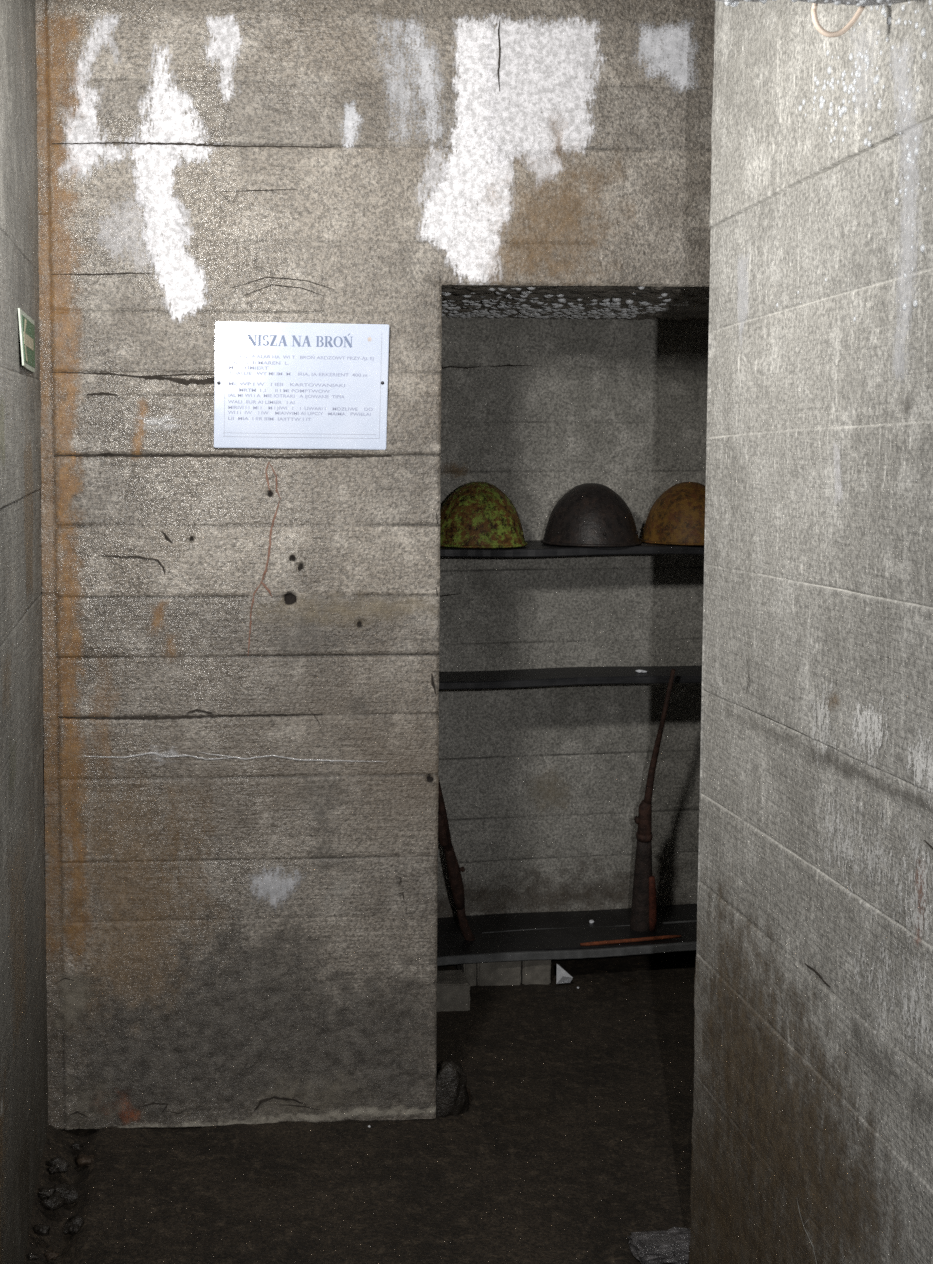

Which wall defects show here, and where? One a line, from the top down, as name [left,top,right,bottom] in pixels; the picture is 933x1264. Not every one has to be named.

water stain [57,14,217,323]
water stain [205,15,242,101]
water stain [380,13,604,285]
crack [54,453,392,656]